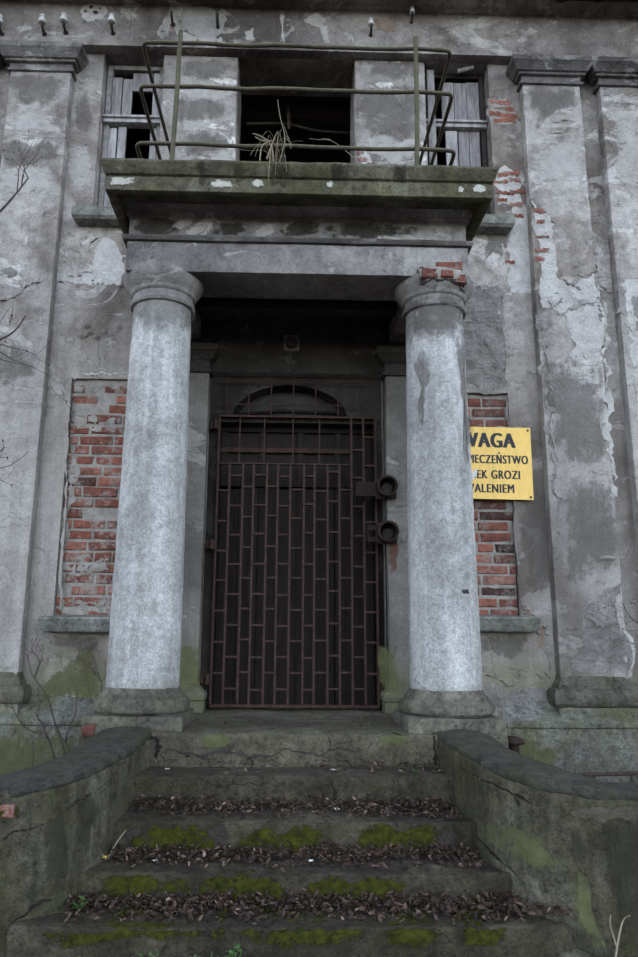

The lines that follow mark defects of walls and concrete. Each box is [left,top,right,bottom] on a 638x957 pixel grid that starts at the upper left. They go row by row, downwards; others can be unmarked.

peeling [80,3,108,23]
flaking render [178,6,229,46]
flaking render [486,95,521,128]
crack [0,235,104,329]
flaking render [416,165,638,536]
crack [150,735,365,787]